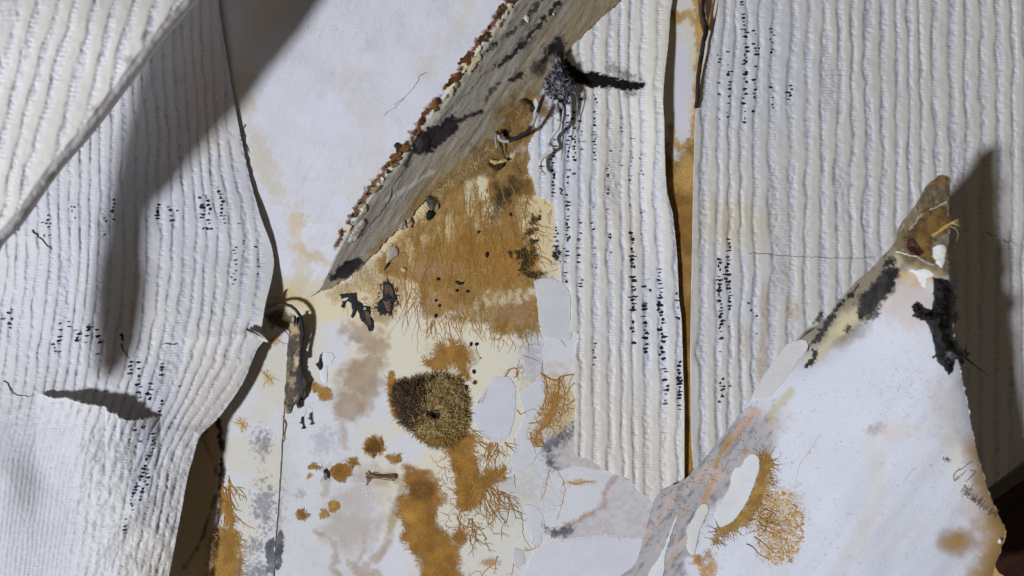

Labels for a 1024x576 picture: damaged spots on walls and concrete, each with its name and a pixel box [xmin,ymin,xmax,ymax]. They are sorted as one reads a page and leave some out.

corrosion [334,0,517,247]
peeling [340,246,407,331]
leakage [310,37,644,420]
peeling [534,278,572,341]
leakage [628,0,805,576]
leakage [804,257,900,368]
peeling [907,238,947,288]
leakage [911,277,990,377]
leakage [306,361,575,576]
peeling [473,376,545,477]
peeling [512,504,643,576]
peeling [648,454,759,576]